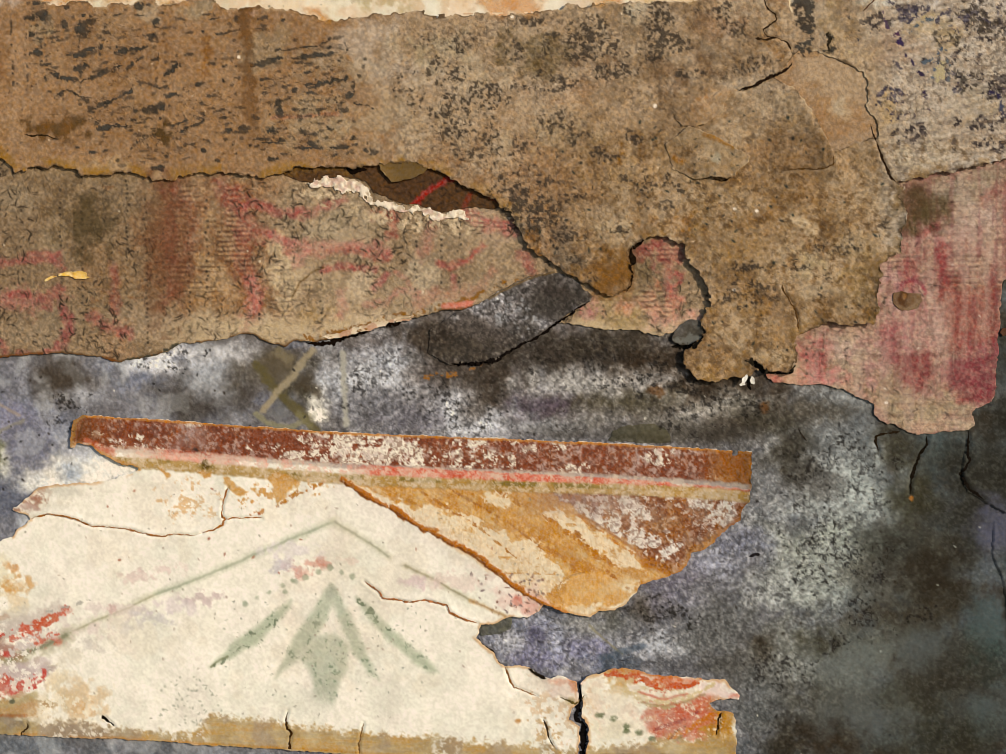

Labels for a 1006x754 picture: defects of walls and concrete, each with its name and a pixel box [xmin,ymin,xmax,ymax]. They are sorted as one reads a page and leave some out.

crack [739,0,793,91]
flaking render [308,175,469,221]
peeling [323,315,414,339]
peeling [427,271,593,364]
leakage [717,260,810,310]
leakage [396,380,482,430]
leakage [578,342,767,438]
crack [32,488,262,537]
leakage [782,512,901,626]
crack [365,581,546,696]
peeling [479,617,512,636]
crack [561,684,588,754]